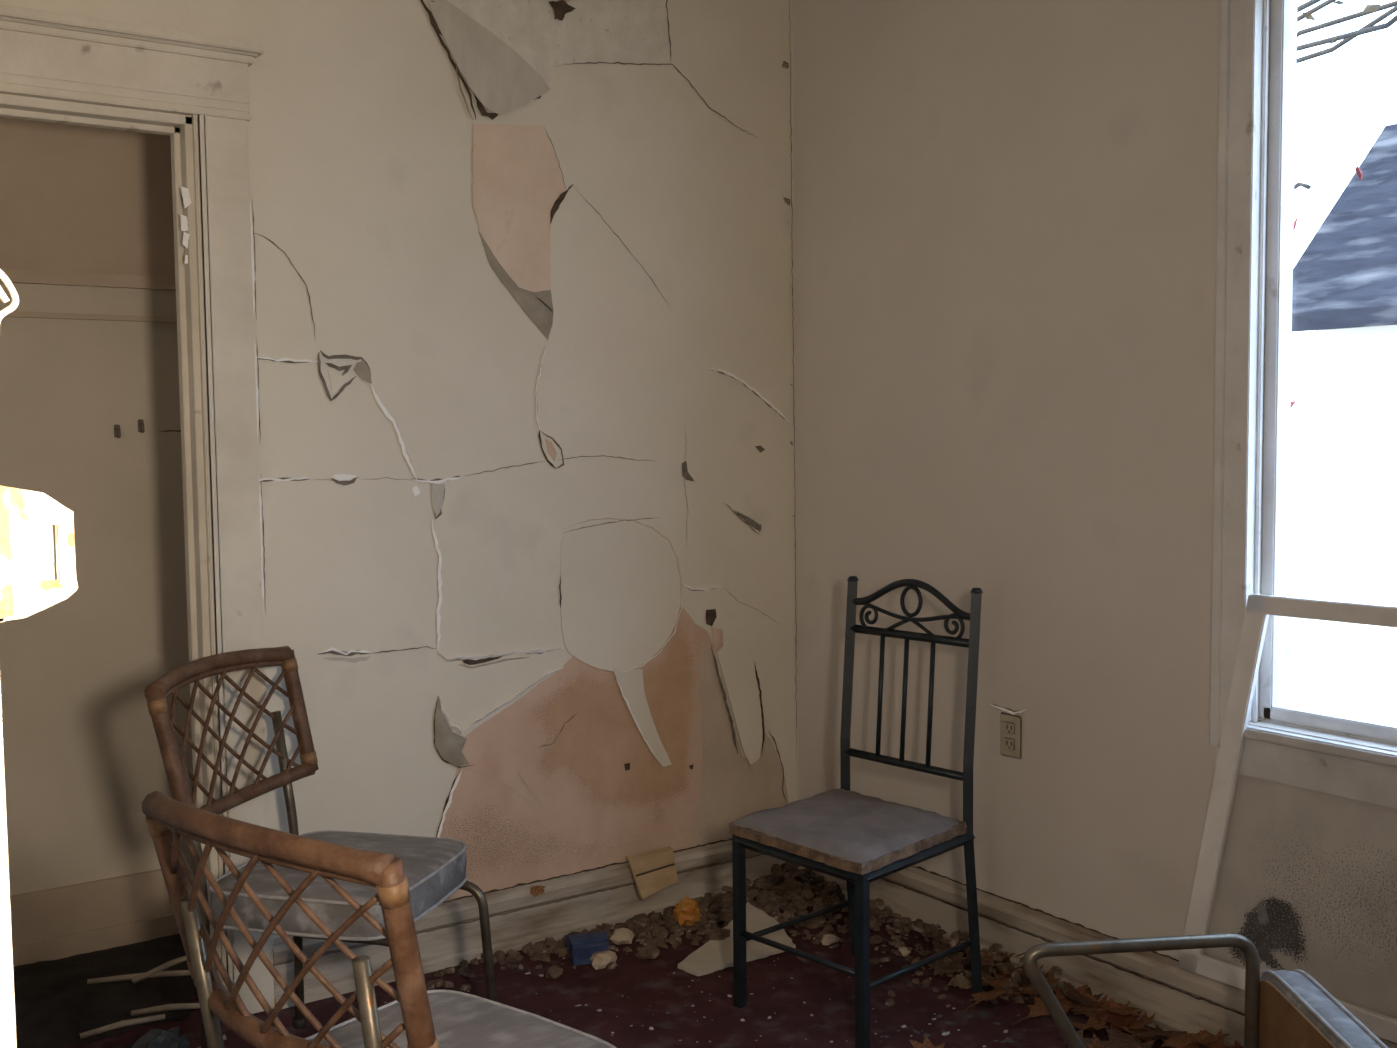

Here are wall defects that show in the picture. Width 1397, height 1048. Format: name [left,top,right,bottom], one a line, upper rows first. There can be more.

flaking render [420,0,671,340]
crack [250,203,317,440]
crack [259,477,311,609]
crack [318,345,694,668]
crack [561,0,797,743]
peeling [433,604,789,902]
water stain [1221,794,1397,996]